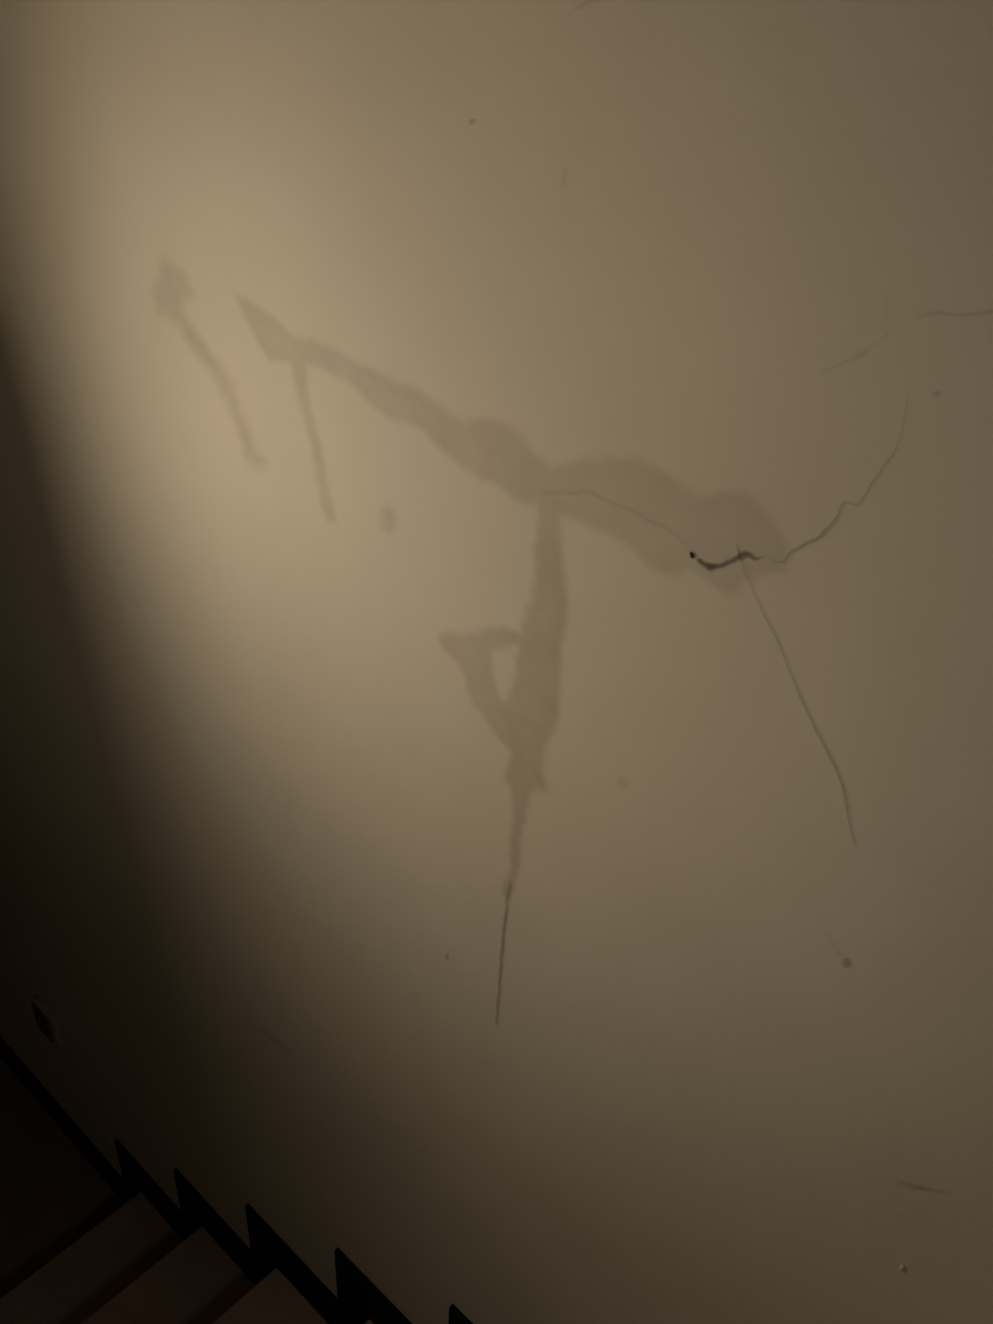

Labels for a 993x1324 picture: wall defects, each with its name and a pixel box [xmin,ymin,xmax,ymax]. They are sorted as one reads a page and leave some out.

crack [690,552,740,569]